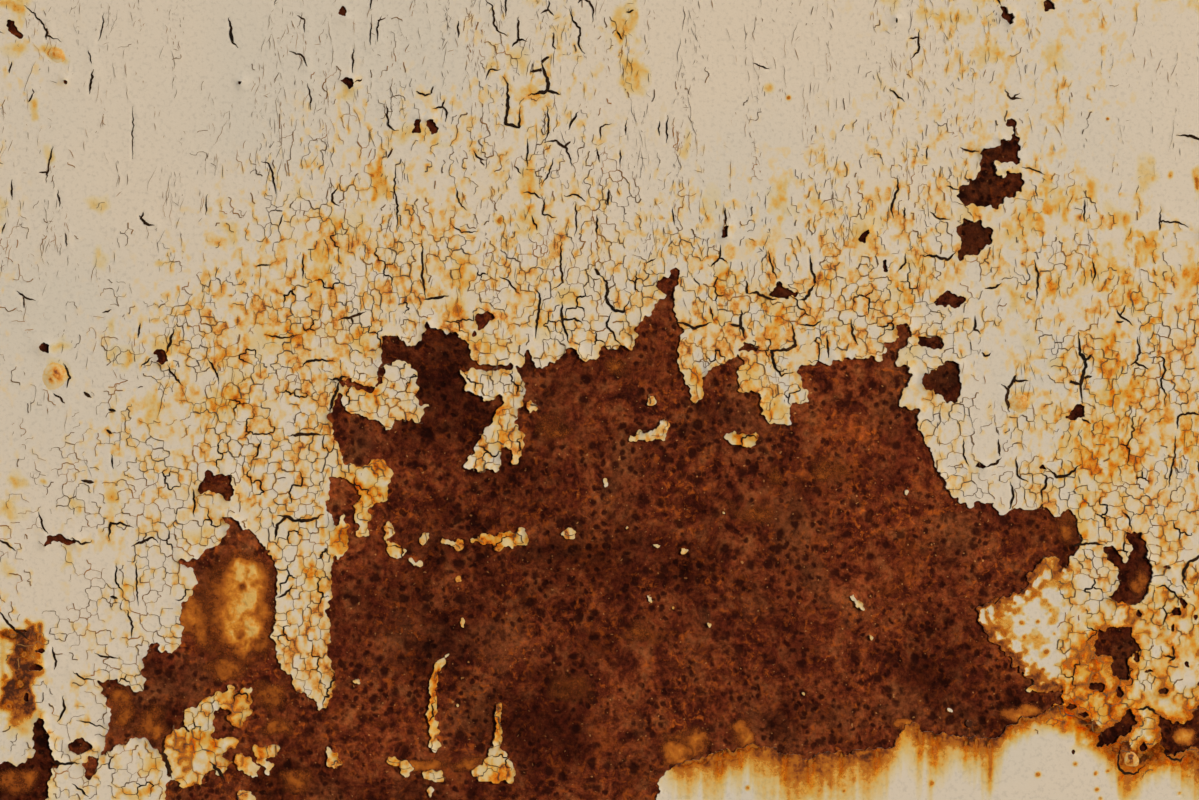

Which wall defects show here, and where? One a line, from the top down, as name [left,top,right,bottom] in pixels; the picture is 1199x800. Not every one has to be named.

crack [24,5,61,125]
crack [79,0,144,137]
crack [228,18,237,46]
crack [995,65,1092,150]
crack [1152,125,1199,161]
crack [109,165,185,271]
peeling [0,268,1089,800]
corrosion [0,620,45,726]
corrosion [180,553,292,734]
corrosion [661,558,1199,794]
corrosion [0,769,39,795]
corrosion [110,688,198,787]